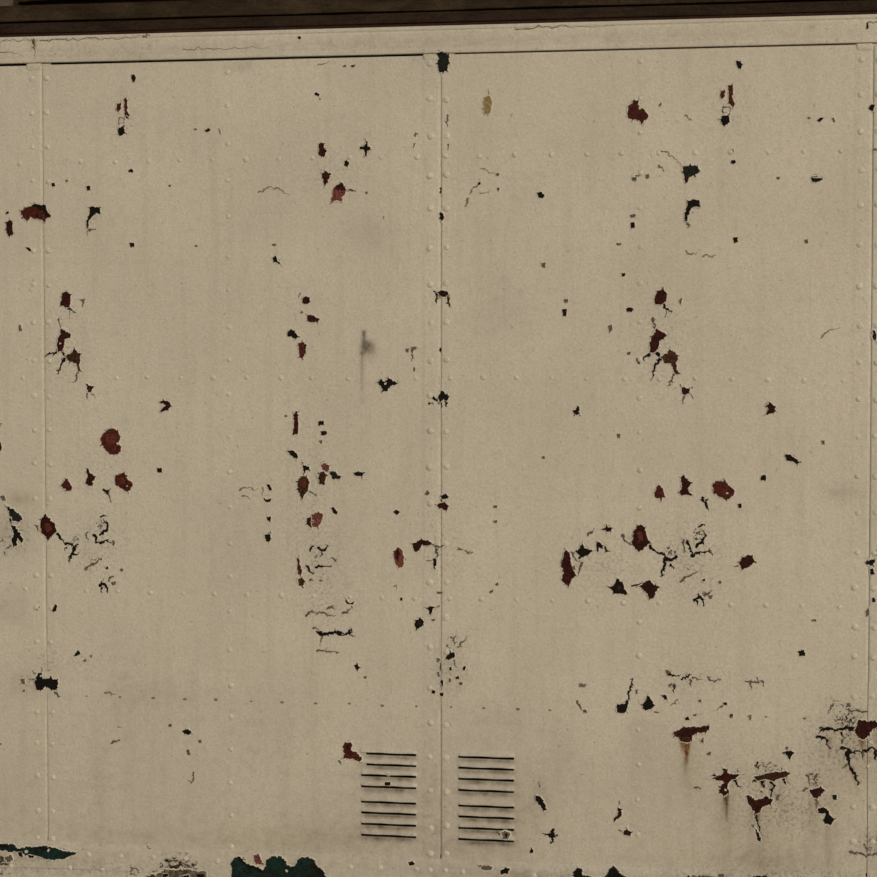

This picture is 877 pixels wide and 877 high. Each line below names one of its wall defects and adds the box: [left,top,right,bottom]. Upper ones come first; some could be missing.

peeling [1,198,56,242]
peeling [45,287,99,399]
peeling [627,284,697,404]
peeling [0,488,65,559]
peeling [57,424,138,496]
peeling [555,520,656,591]
crack [649,496,721,613]
peeling [648,470,743,509]
crack [305,605,356,654]
rust [664,680,877,877]
peeling [0,842,83,864]
peeling [117,848,351,877]